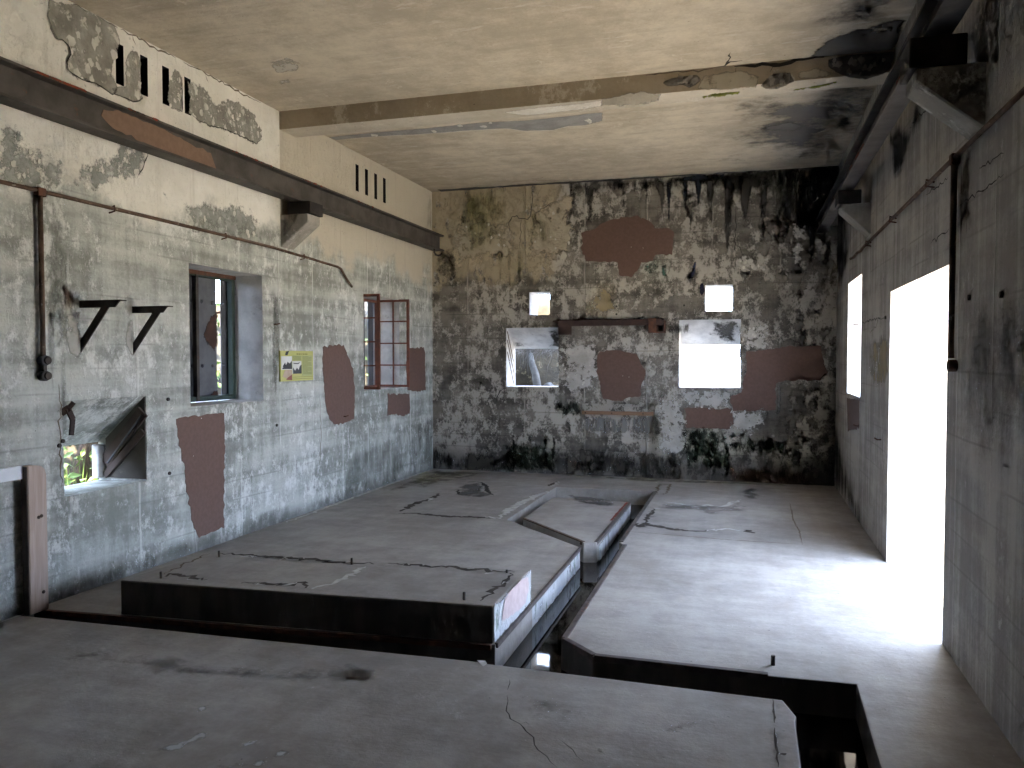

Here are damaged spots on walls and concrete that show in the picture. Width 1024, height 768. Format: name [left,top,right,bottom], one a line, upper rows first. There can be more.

flaking render [47,0,143,102]
flaking render [167,70,262,144]
spalling [761,73,794,89]
spalling [828,52,894,79]
flaking render [0,128,62,189]
flaking render [75,145,148,191]
leakage [437,88,868,285]
peeling [559,343,598,394]
peeling [655,390,765,455]
leakage [433,449,514,472]
leakage [565,448,681,479]
crack [506,683,583,765]